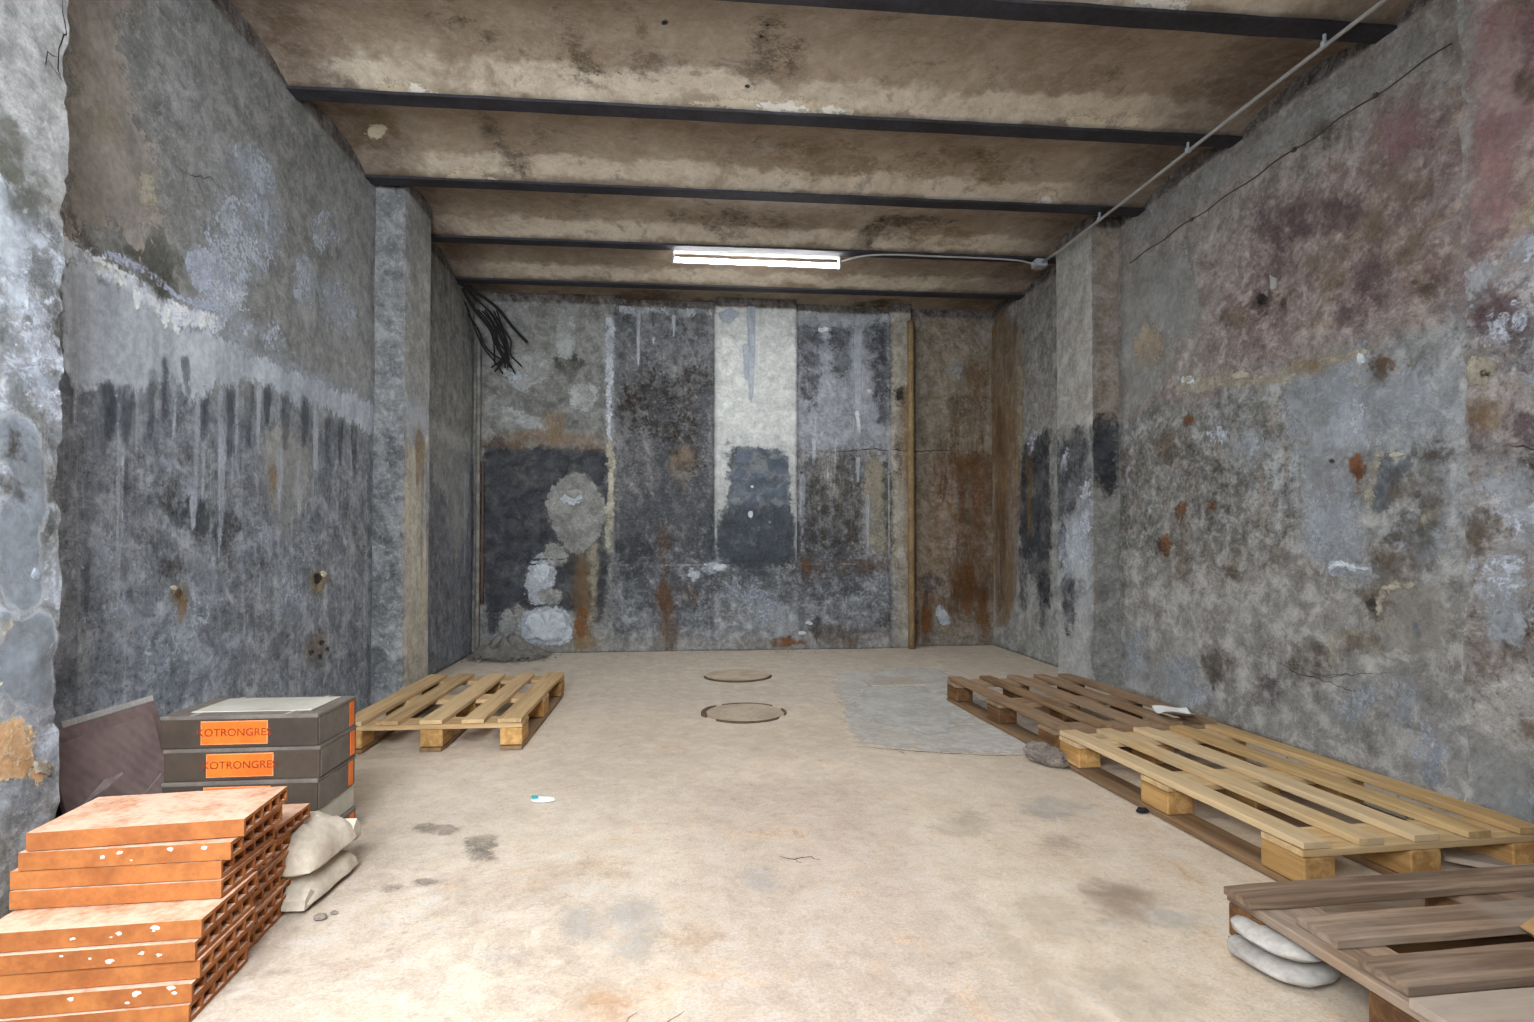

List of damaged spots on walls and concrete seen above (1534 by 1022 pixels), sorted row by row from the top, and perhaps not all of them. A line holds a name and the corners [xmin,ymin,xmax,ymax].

water stain [64,141,358,353]
water stain [1255,180,1388,273]
water stain [1464,232,1534,349]
peeling [0,411,58,786]
water stain [142,596,213,682]
water stain [164,420,317,613]
water stain [486,587,505,633]
peeling [531,542,569,606]